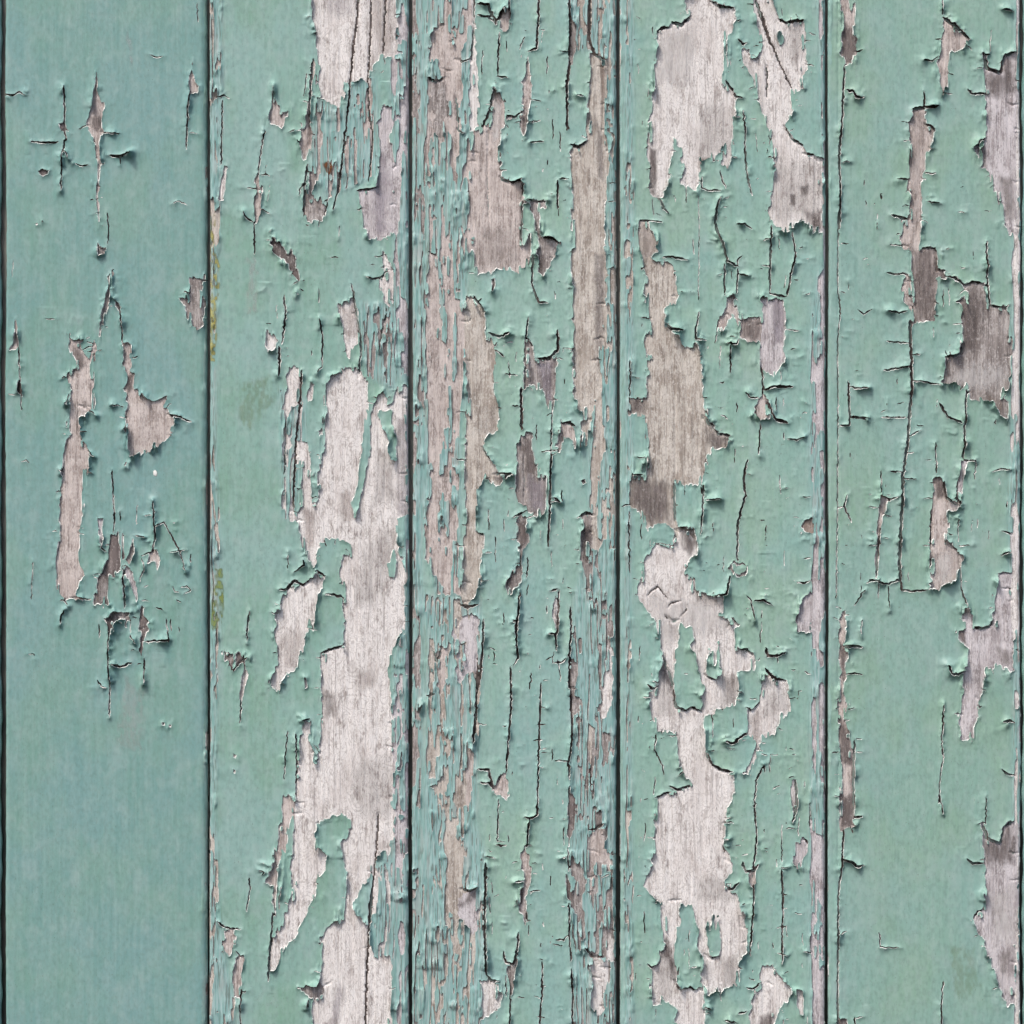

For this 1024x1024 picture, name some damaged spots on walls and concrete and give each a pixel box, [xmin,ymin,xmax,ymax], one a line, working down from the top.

crack [28,84,73,193]
crack [106,150,133,168]
peeling [51,68,191,715]
crack [109,467,191,587]
peeling [244,0,864,1024]
peeling [868,0,1021,1024]